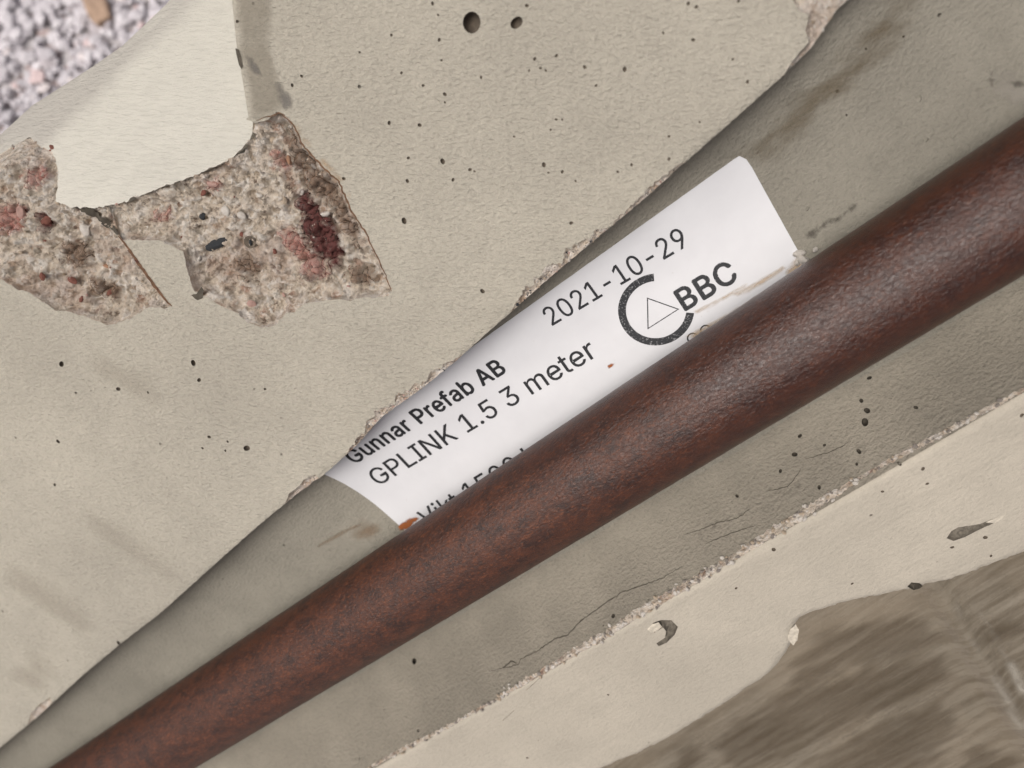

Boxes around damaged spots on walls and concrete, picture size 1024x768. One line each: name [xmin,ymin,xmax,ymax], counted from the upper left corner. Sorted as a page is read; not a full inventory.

corrosion [0,208,53,230]
corrosion [62,243,91,266]
corrosion [94,279,116,295]
spalling [0,112,392,328]
corrosion [277,132,373,284]
corrosion [398,518,418,530]
crack [683,442,848,544]
crack [491,567,680,671]
spalling [367,388,1024,768]